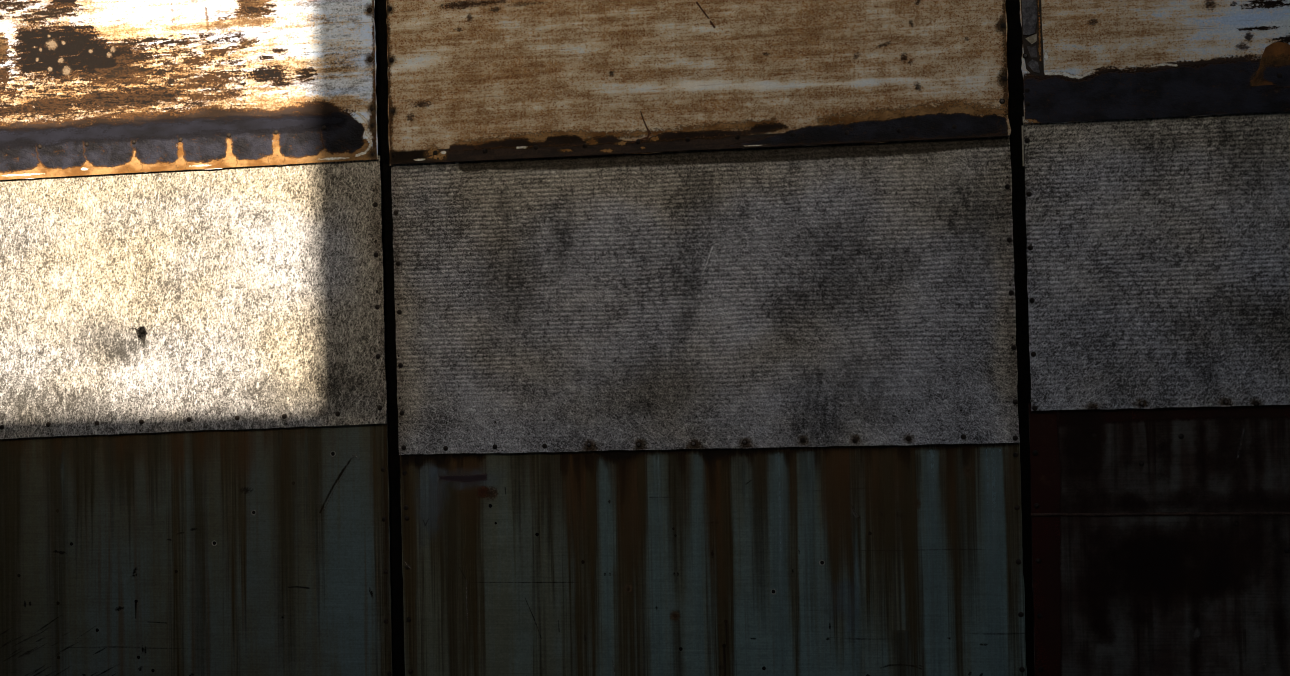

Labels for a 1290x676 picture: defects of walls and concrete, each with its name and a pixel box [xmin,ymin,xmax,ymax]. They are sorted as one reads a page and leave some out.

peeling [0,0,373,180]
corrosion [363,0,431,164]
corrosion [440,0,543,32]
peeling [440,99,1009,154]
peeling [1022,0,1290,124]
corrosion [1057,397,1290,517]
corrosion [94,427,324,676]
corrosion [369,423,485,676]
corrosion [512,434,1026,676]